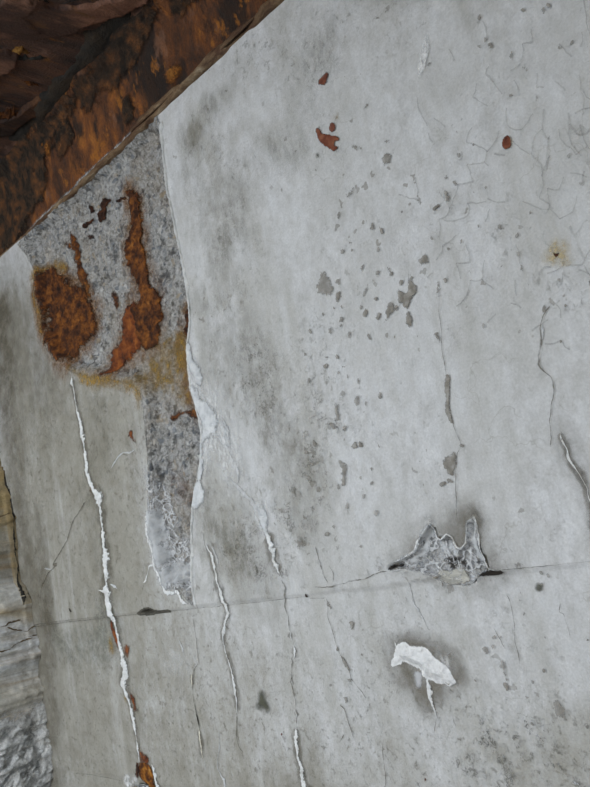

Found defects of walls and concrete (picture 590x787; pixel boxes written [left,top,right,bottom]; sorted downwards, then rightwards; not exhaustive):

corrosion [130,66,181,132]
corrosion [316,122,339,151]
corrosion [31,234,99,370]
spalling [18,116,200,606]
corrosion [77,183,198,421]
crack [538,307,590,501]
crack [0,459,68,652]
crack [42,377,159,787]
crack [179,533,243,787]
crack [210,418,306,787]
crack [305,546,387,738]
corrosion [135,752,155,787]